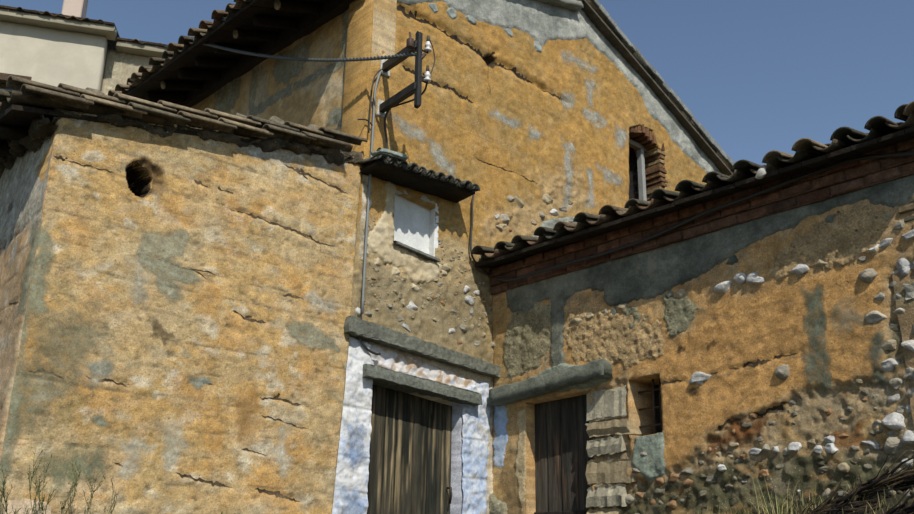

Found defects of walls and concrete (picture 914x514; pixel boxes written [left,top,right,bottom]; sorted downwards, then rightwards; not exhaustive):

peeling [428,3,477,25]
crack [397,4,566,103]
crack [53,155,115,173]
spalling [126,157,164,197]
crack [233,310,266,323]
water stain [803,287,861,388]
crack [711,353,797,374]
crack [260,393,305,428]
crack [175,472,233,488]
crack [256,488,299,502]